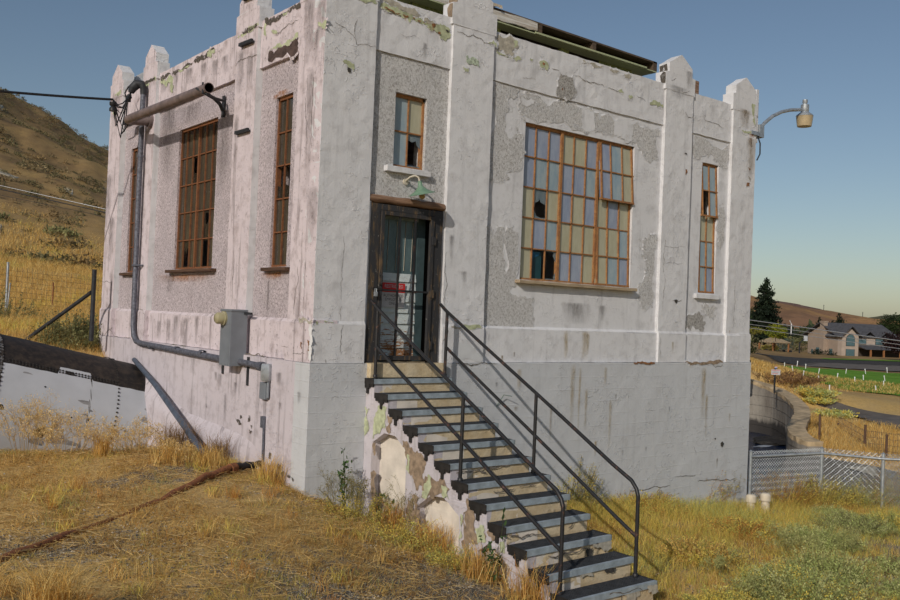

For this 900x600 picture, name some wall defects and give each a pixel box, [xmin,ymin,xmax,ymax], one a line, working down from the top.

flaking render [238,0,309,64]
peeling [360,0,458,42]
peeling [487,32,550,70]
peeling [582,60,634,102]
flaking render [489,73,661,184]
flaking render [685,134,730,171]
flaking render [450,224,535,331]
flaking render [636,232,658,312]
flaking render [685,299,717,333]
peeling [455,341,482,362]
peeling [403,441,449,530]
peeling [459,499,505,553]